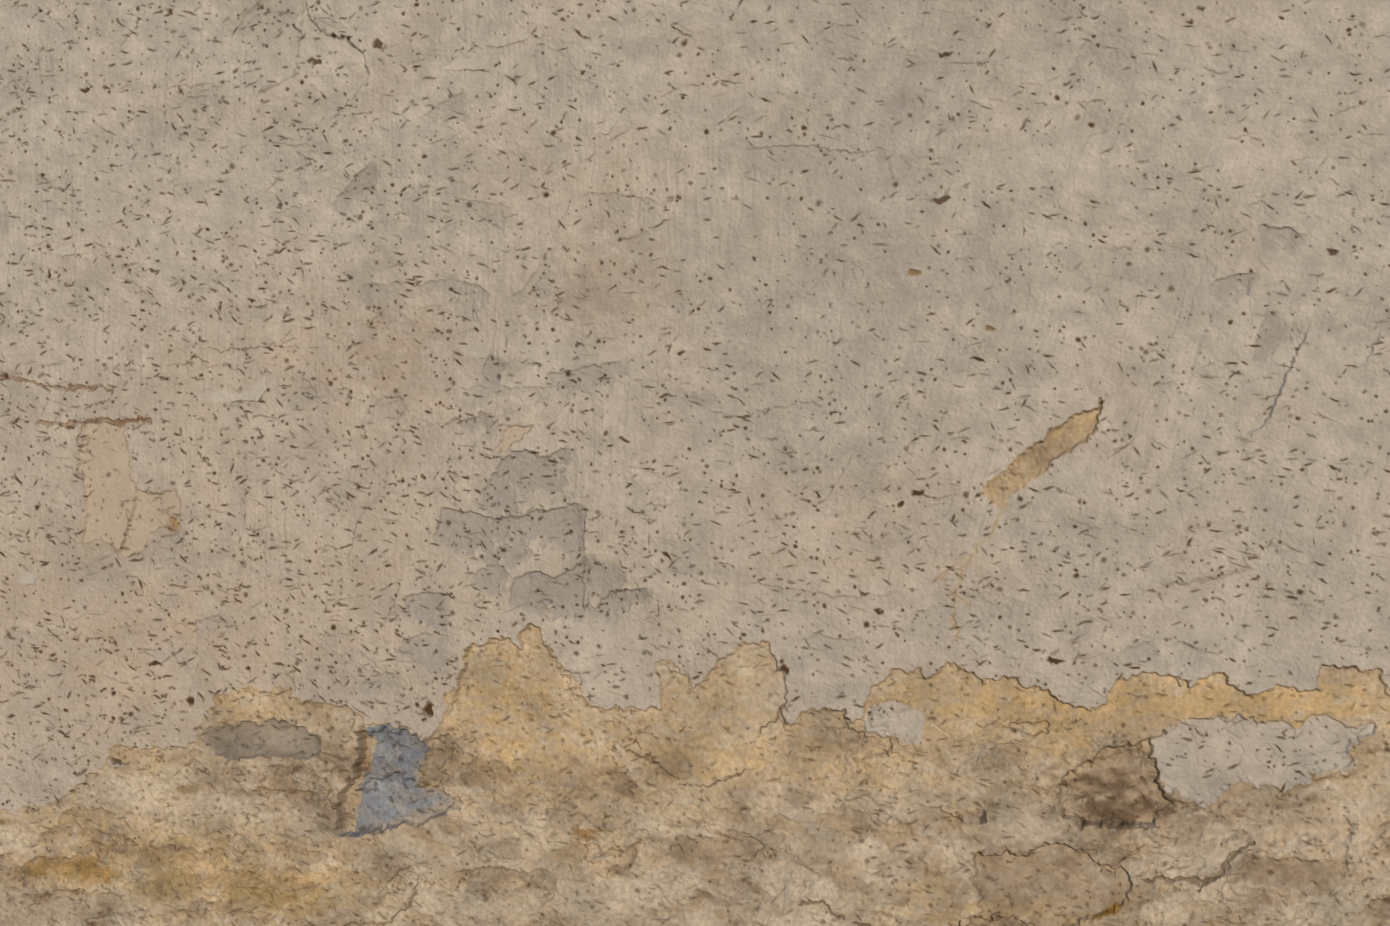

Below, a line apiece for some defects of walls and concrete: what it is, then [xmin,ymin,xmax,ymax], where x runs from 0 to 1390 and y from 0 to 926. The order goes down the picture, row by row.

spalling [928,194,953,206]
peeling [1202,222,1310,301]
spalling [1326,248,1342,258]
peeling [1233,323,1321,445]
spalling [0,354,1390,926]